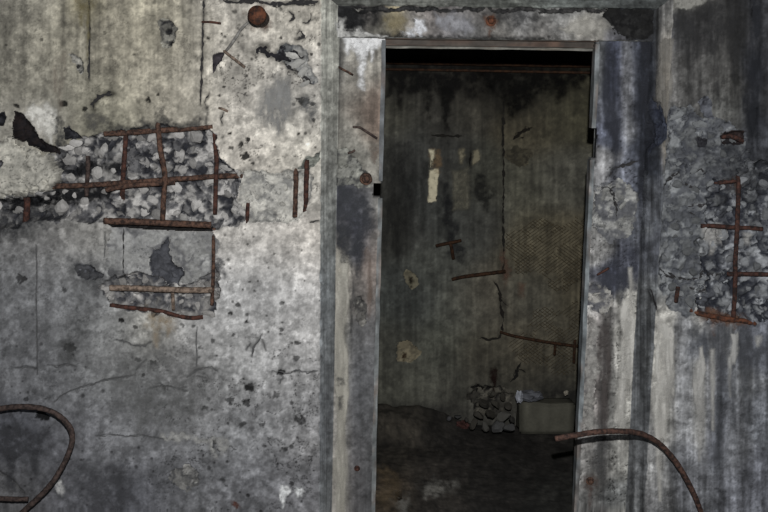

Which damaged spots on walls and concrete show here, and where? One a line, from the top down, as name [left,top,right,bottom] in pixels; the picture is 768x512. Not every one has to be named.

water stain [656,38,673,118]
spalling [0,111,320,320]
crack [480,98,533,341]
water stain [638,148,648,233]
spalling [645,98,768,327]
water stain [703,223,728,253]
crack [510,363,525,382]
water stain [582,319,602,429]
water stain [614,264,638,471]
water stain [652,322,674,501]
water stain [693,332,747,430]